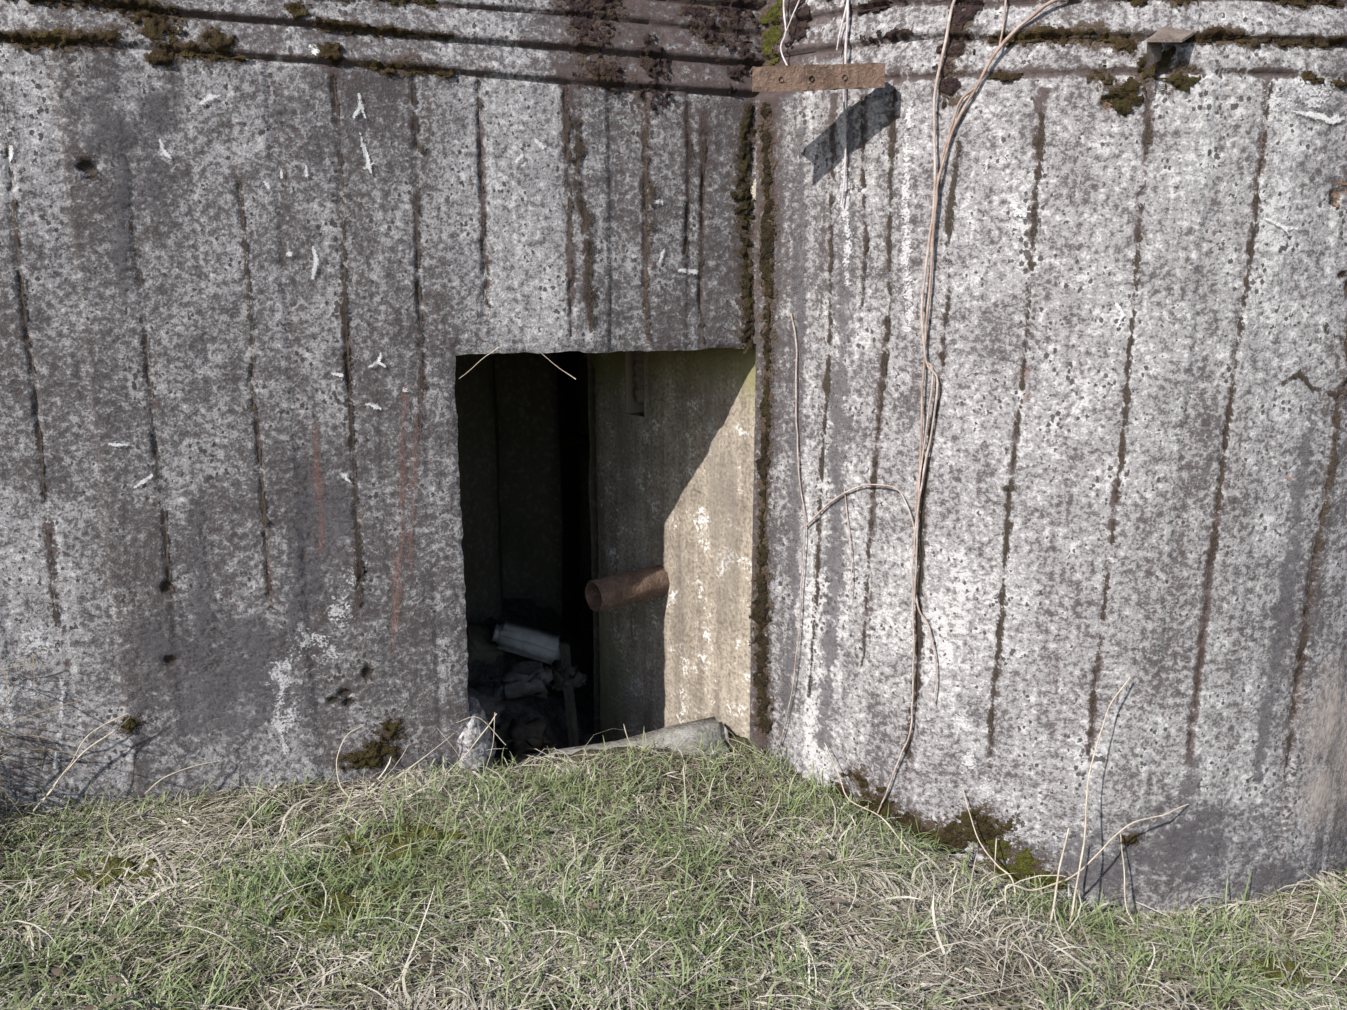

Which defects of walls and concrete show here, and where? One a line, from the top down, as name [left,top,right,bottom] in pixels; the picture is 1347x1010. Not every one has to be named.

damp [0,627,66,769]
damp [87,449,362,757]
damp [1019,756,1319,913]
crack [1281,324,1347,773]